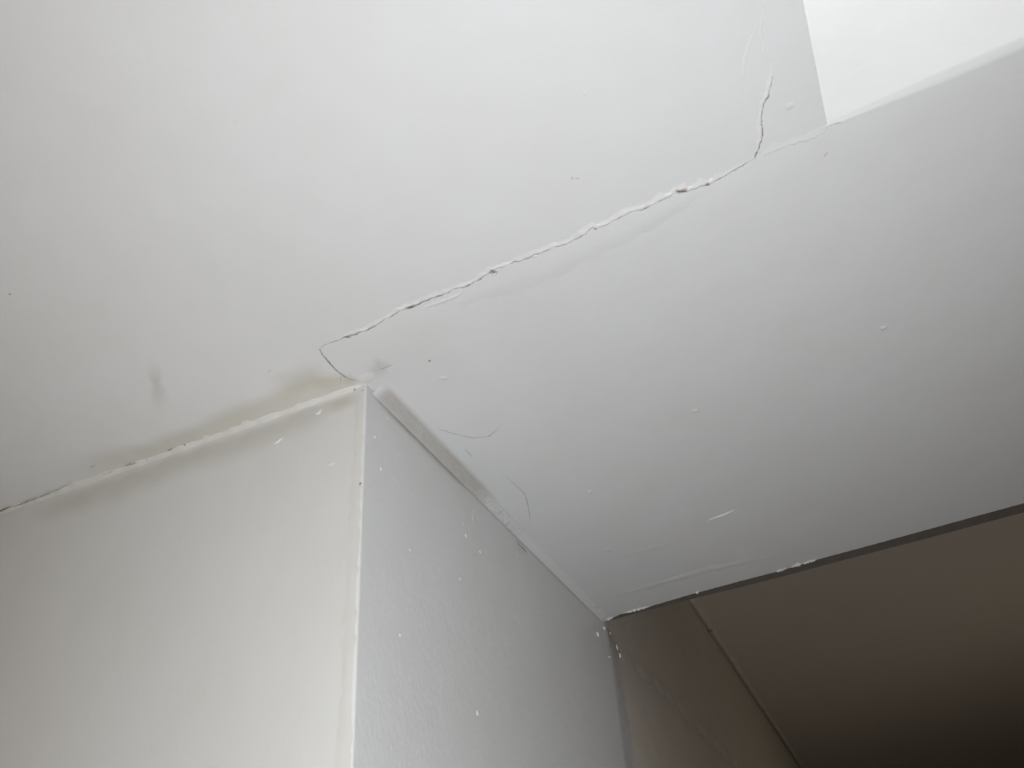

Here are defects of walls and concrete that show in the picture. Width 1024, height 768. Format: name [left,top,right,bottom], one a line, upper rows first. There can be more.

crack [0,1,773,515]